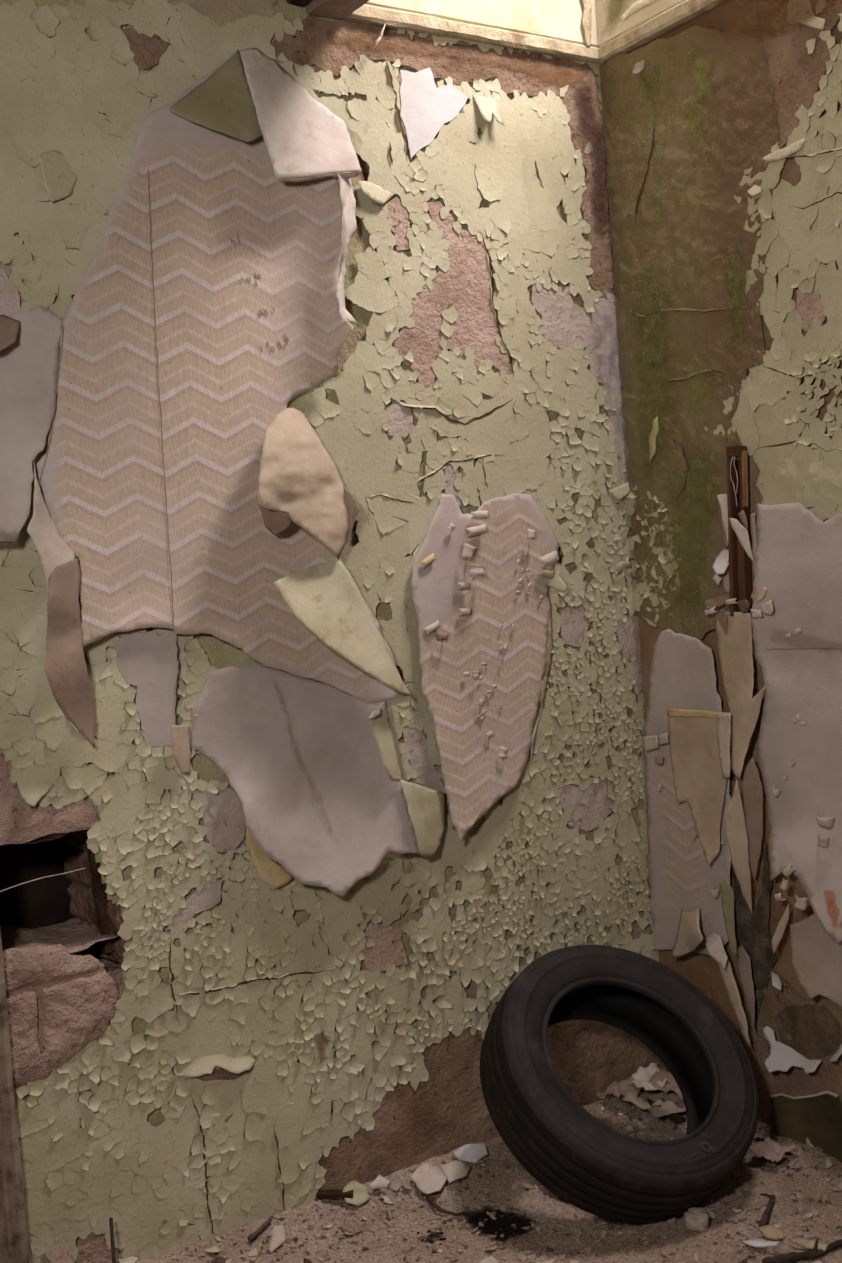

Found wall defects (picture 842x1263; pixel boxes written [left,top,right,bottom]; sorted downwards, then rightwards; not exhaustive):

crack [785,147,842,159]
peeling [0,0,617,439]
crack [789,185,842,209]
crack [763,355,842,379]
crack [754,441,842,452]
flaking render [304,0,842,1004]
peeling [0,404,501,1263]
flaking render [547,1020,665,1106]